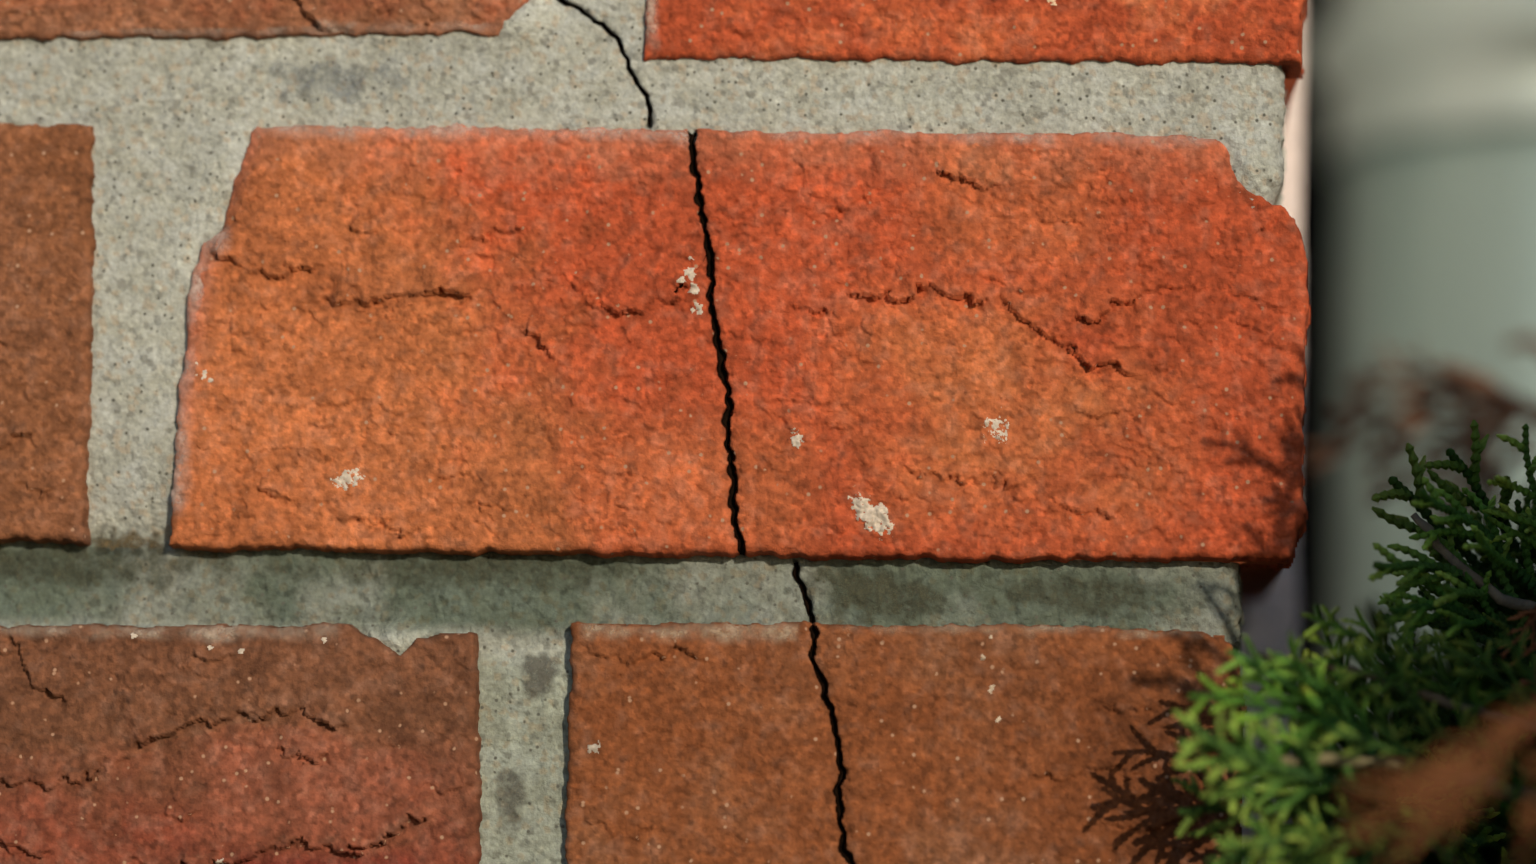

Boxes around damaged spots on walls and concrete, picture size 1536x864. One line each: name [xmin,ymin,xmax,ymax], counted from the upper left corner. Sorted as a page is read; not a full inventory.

crack [559,0,652,126]
crack [674,131,745,555]
crack [792,562,854,864]